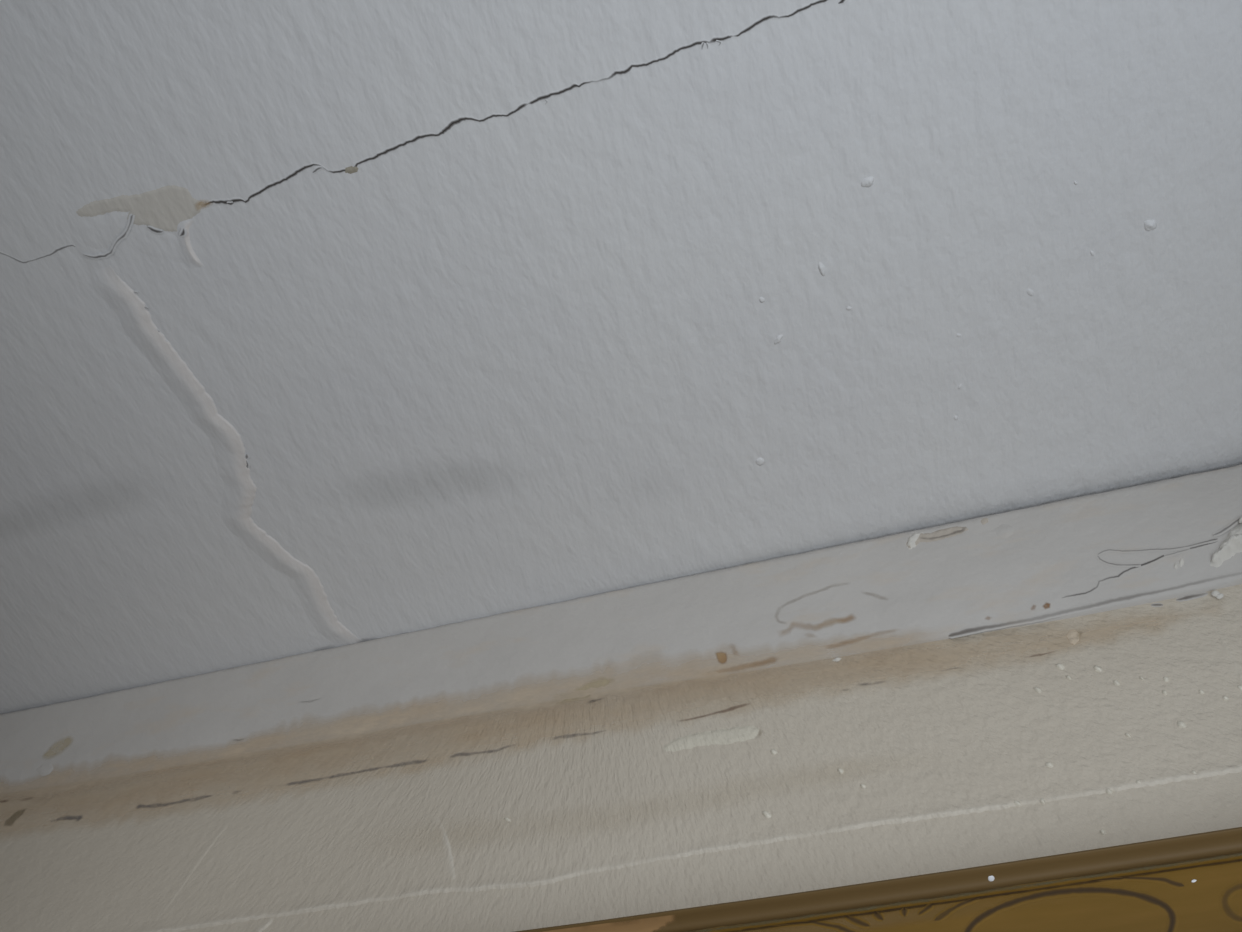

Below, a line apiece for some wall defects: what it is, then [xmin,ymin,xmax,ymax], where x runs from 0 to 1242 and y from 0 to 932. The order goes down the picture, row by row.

crack [203,0,848,207]
crack [0,214,135,264]
crack [948,515,1242,639]
damp [0,656,761,797]